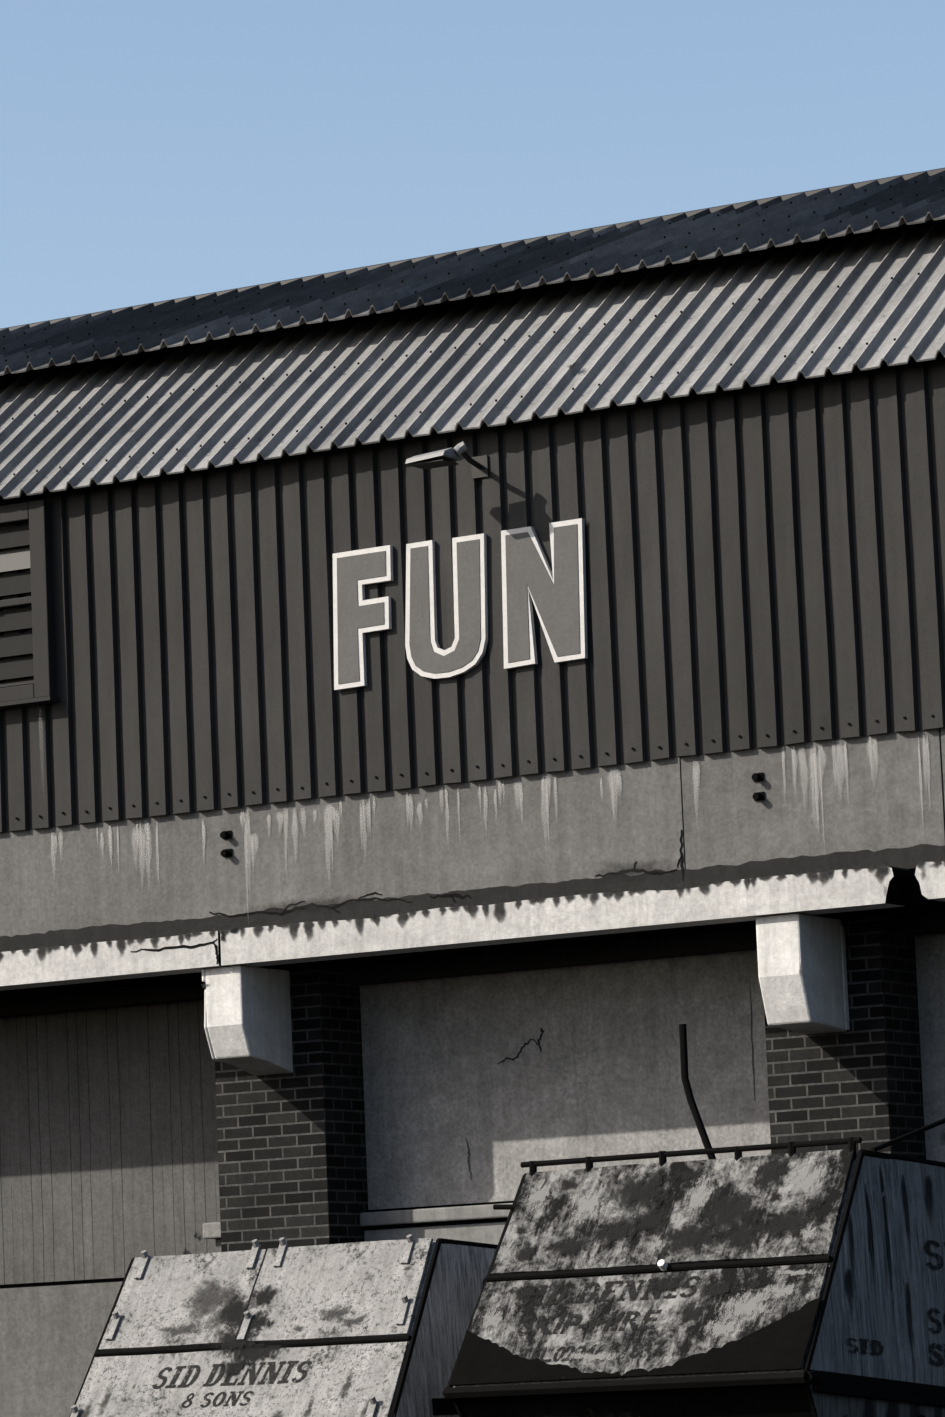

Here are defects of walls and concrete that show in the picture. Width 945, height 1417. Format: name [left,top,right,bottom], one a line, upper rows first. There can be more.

damp [915,858,945,868]
crack [130,892,471,964]
damp [0,863,889,959]
crack [497,1028,545,1064]